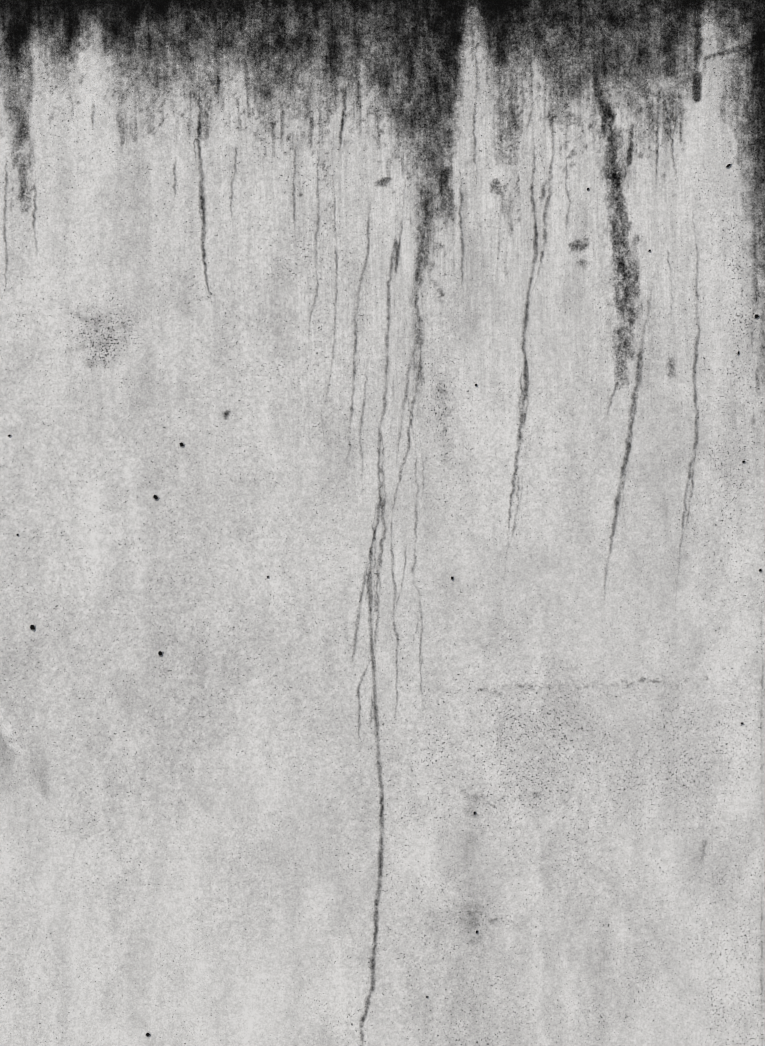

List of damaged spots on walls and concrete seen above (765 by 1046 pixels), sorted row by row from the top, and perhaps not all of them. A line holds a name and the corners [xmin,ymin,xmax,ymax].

leakage [0,0,765,375]
crack [510,157,567,503]
crack [610,352,641,545]
crack [361,762,384,1036]